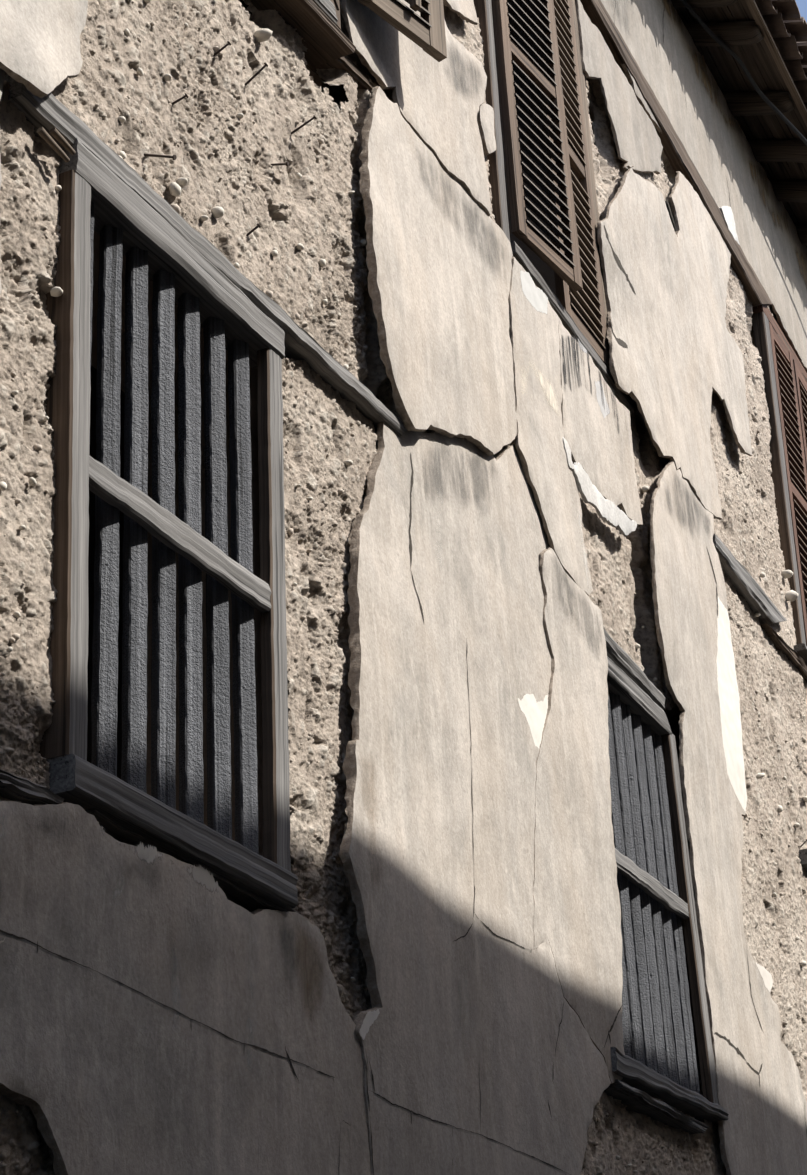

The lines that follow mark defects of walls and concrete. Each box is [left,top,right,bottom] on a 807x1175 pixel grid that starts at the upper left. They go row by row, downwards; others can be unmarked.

spalling [0,0,496,789]
crack [409,458,424,621]
flaking render [508,0,807,1175]
flaking render [0,357,380,1175]
crack [0,929,335,1081]
crack [604,1004,623,1047]
crack [338,1049,571,1175]